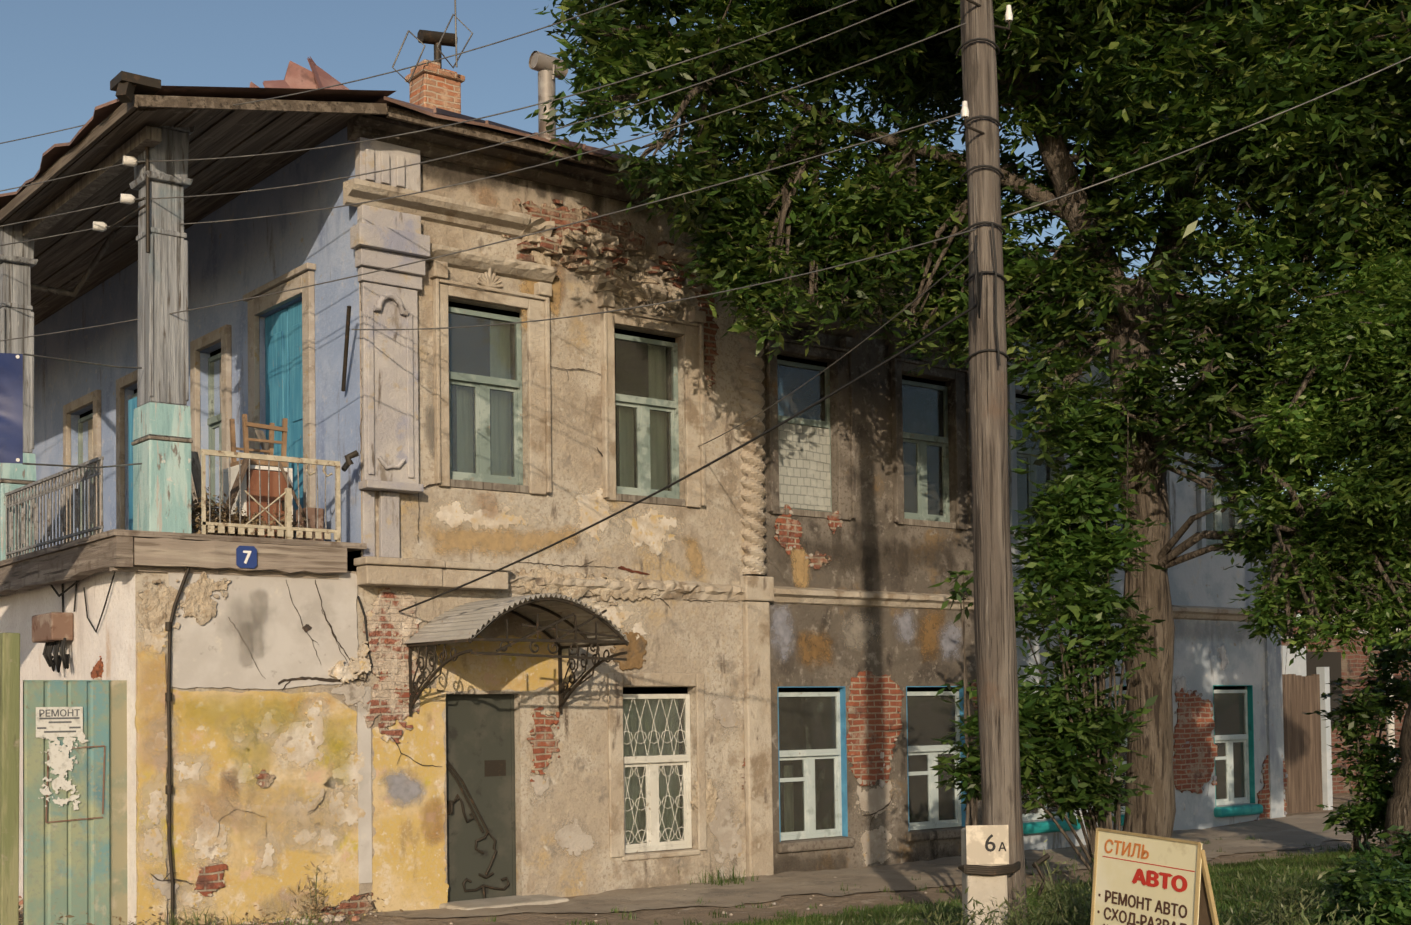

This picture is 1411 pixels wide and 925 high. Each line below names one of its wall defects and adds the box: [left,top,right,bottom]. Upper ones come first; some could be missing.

flaking render [511,198,631,255]
flaking render [615,268,719,389]
flaking render [436,501,528,532]
flaking render [575,488,677,556]
flaking render [137,572,231,654]
flaking render [151,726,202,782]
flaking render [231,588,423,847]
crack [229,579,442,767]
flaking render [527,707,560,800]
flaking render [846,670,905,866]
flaking render [1173,688,1218,794]
flaking render [143,789,230,908]